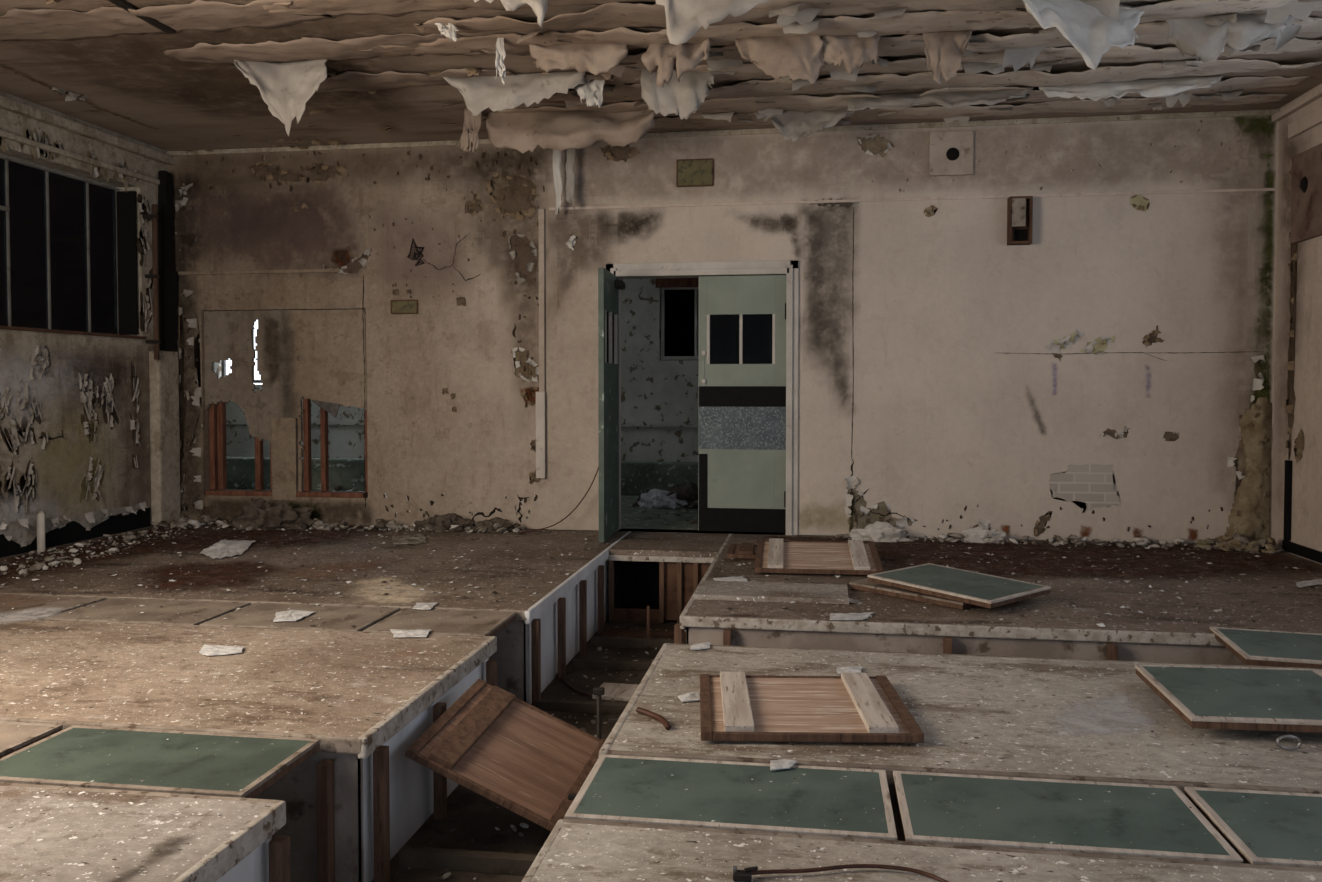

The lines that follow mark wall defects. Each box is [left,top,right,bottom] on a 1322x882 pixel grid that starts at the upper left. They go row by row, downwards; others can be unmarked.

peeling [234,59,328,137]
peeling [435,23,460,42]
damp [0,157,370,590]
flaking render [0,289,618,651]
damp [752,204,851,369]
flaking render [821,463,1322,630]
damp [1236,115,1297,403]
peeling [1250,233,1304,463]